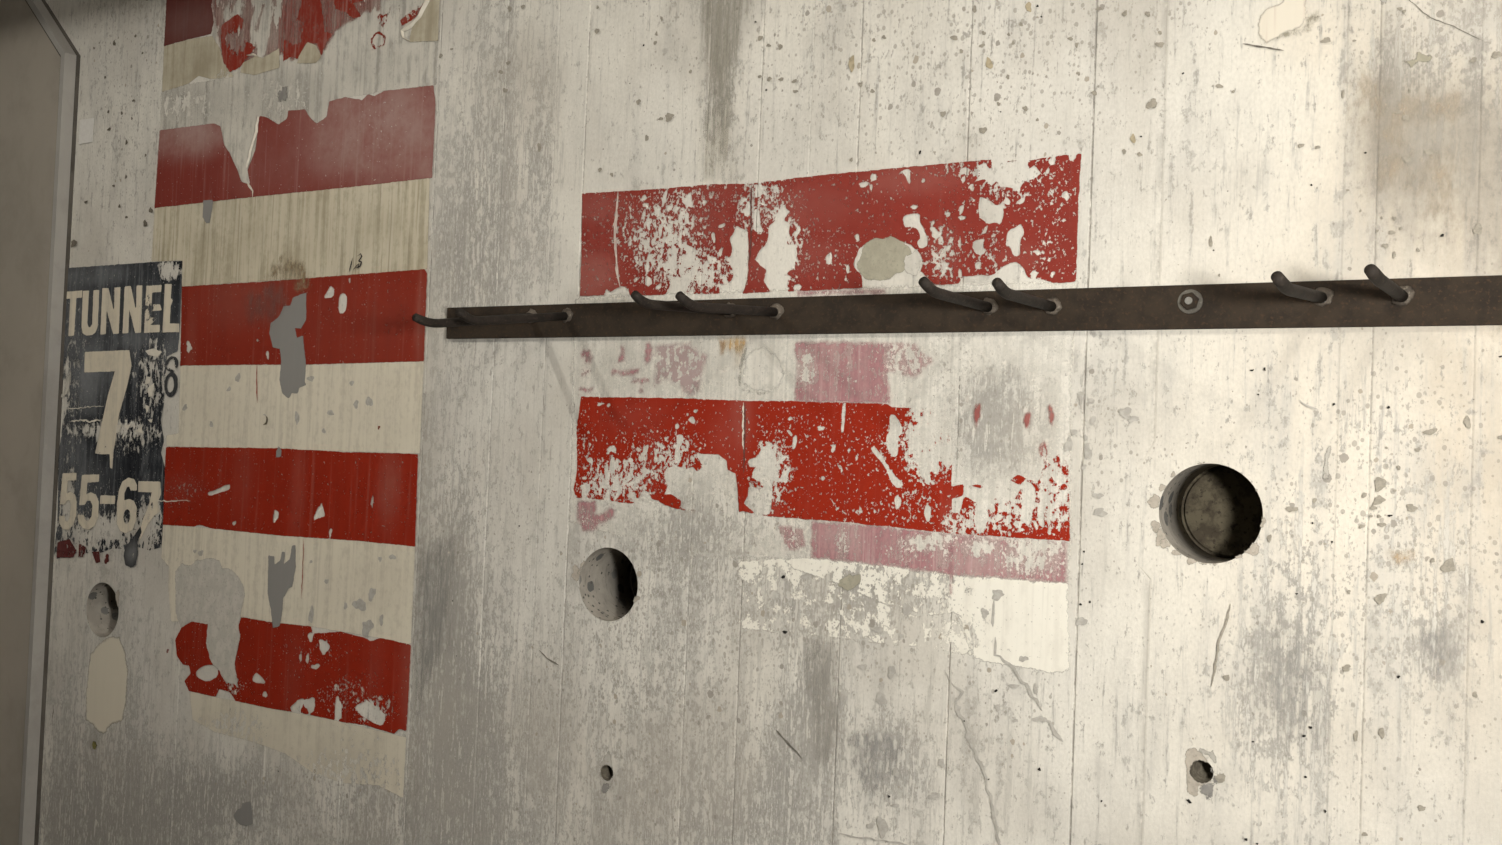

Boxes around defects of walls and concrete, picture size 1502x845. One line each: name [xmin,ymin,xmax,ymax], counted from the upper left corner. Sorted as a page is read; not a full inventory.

peeling [160,0,453,184]
spalling [798,236,922,294]
peeling [663,494,681,507]
peeling [738,466,760,512]
peeling [175,550,406,798]